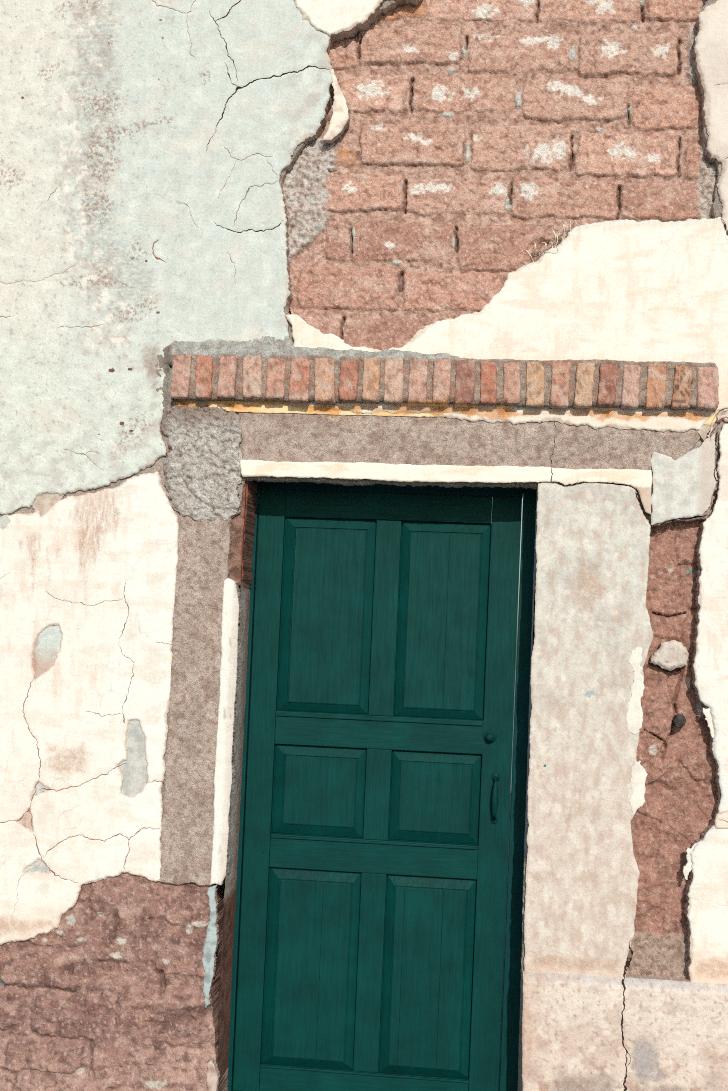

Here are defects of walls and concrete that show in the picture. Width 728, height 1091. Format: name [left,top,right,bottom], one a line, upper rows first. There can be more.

crack [152,0,326,284]
spalling [283,0,717,351]
peeling [25,860,50,873]
peeling [32,626,62,680]
crack [0,677,160,911]
peeling [118,720,148,796]
spalling [626,520,718,978]
spalling [0,873,228,1091]
crack [621,942,633,1091]